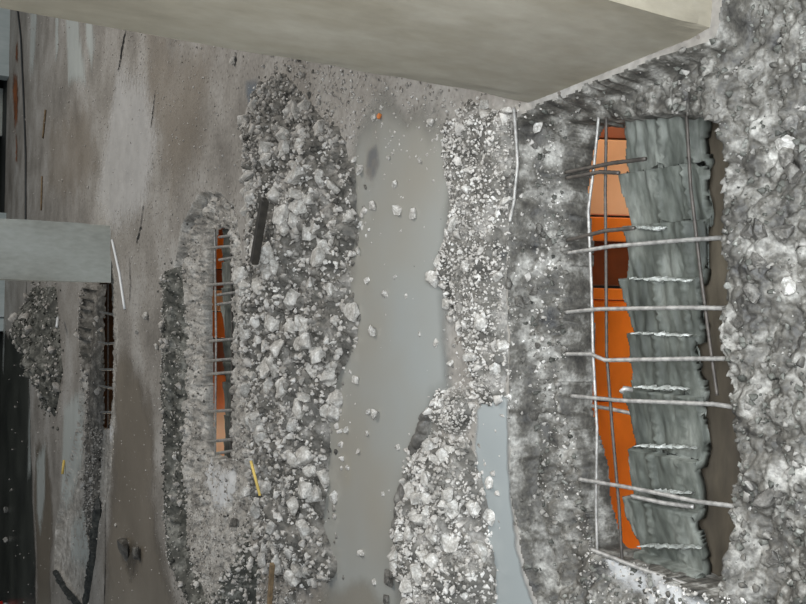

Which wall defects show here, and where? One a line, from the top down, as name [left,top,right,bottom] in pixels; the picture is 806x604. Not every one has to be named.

spalling [54,369,94,604]
spalling [98,256,118,521]
spalling [173,190,253,604]
spalling [506,0,806,604]